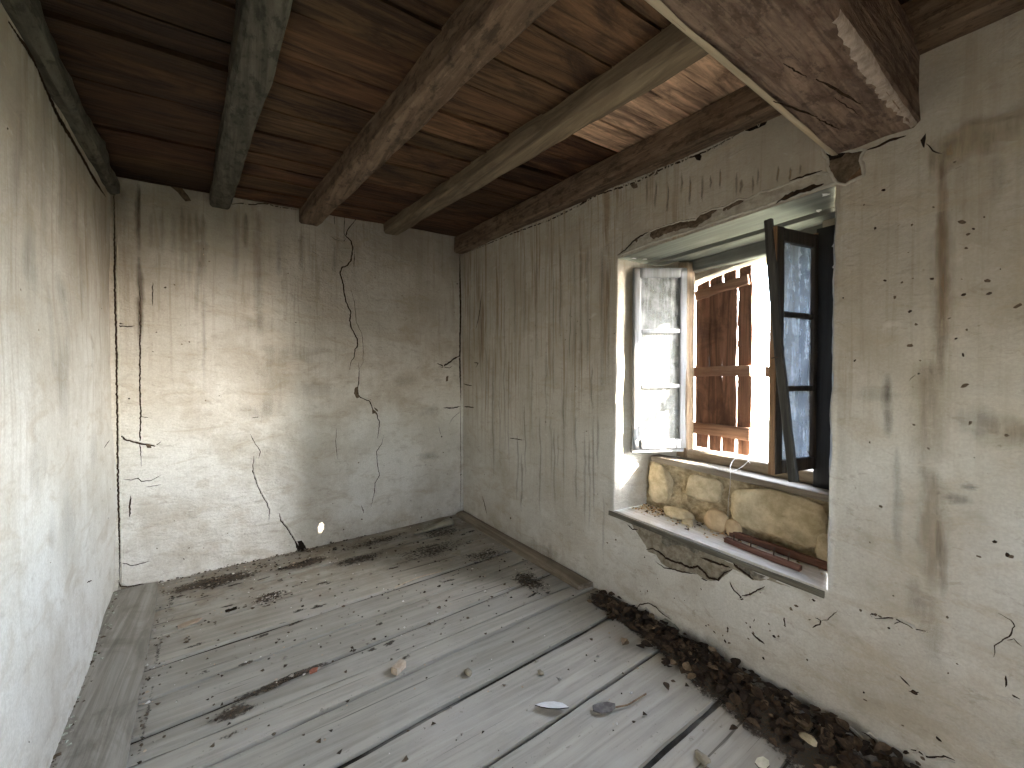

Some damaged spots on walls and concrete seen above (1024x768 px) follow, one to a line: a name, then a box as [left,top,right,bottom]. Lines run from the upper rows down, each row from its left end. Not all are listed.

spalling [471,122,767,252]
spalling [618,136,905,260]
crack [8,22,162,583]
crack [331,217,383,501]
crack [250,434,306,551]
spalling [627,524,789,590]
crack [870,613,928,634]
crack [994,613,1021,699]